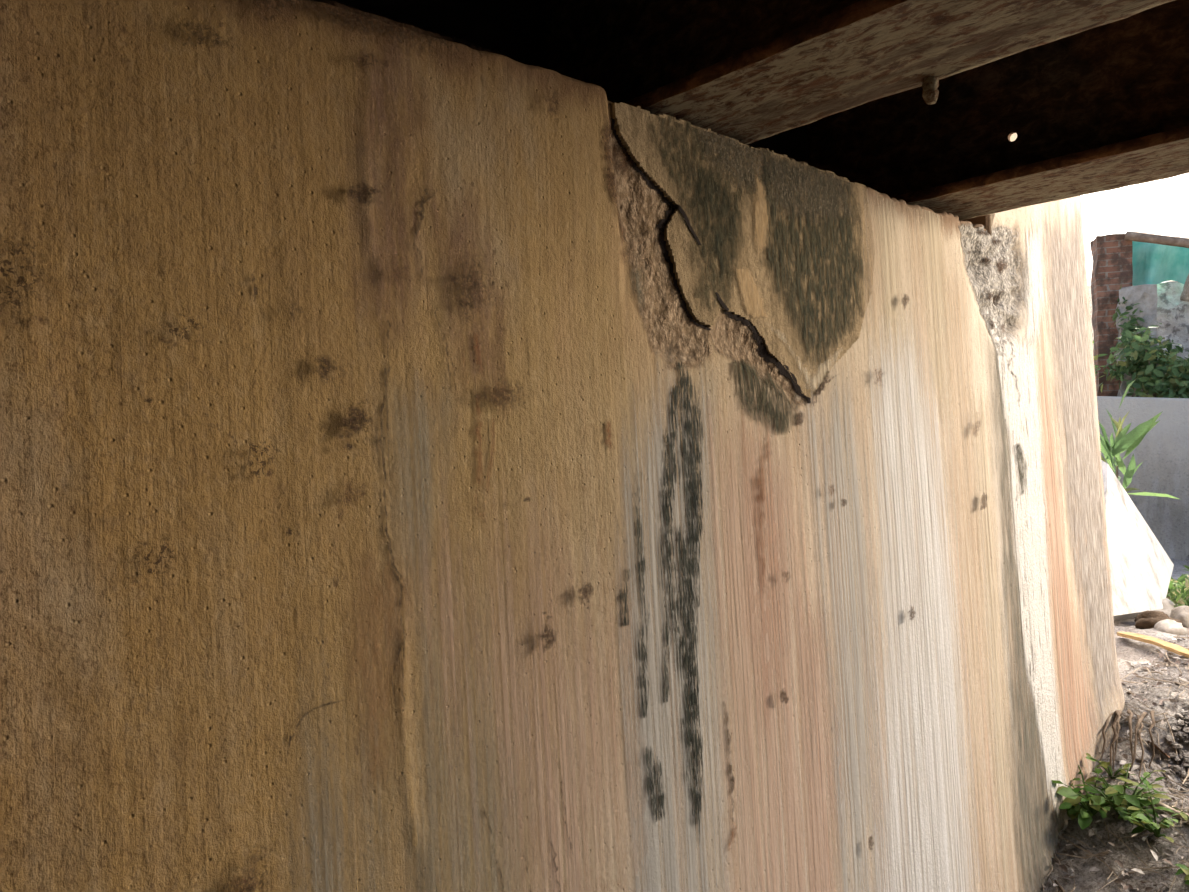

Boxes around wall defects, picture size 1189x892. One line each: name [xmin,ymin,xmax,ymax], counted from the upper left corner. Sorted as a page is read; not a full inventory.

damp [0,241,40,307]
crack [611,118,831,405]
flaking render [608,102,876,408]
damp [620,202,1010,892]
peeling [959,223,1067,816]
damp [495,611,616,892]